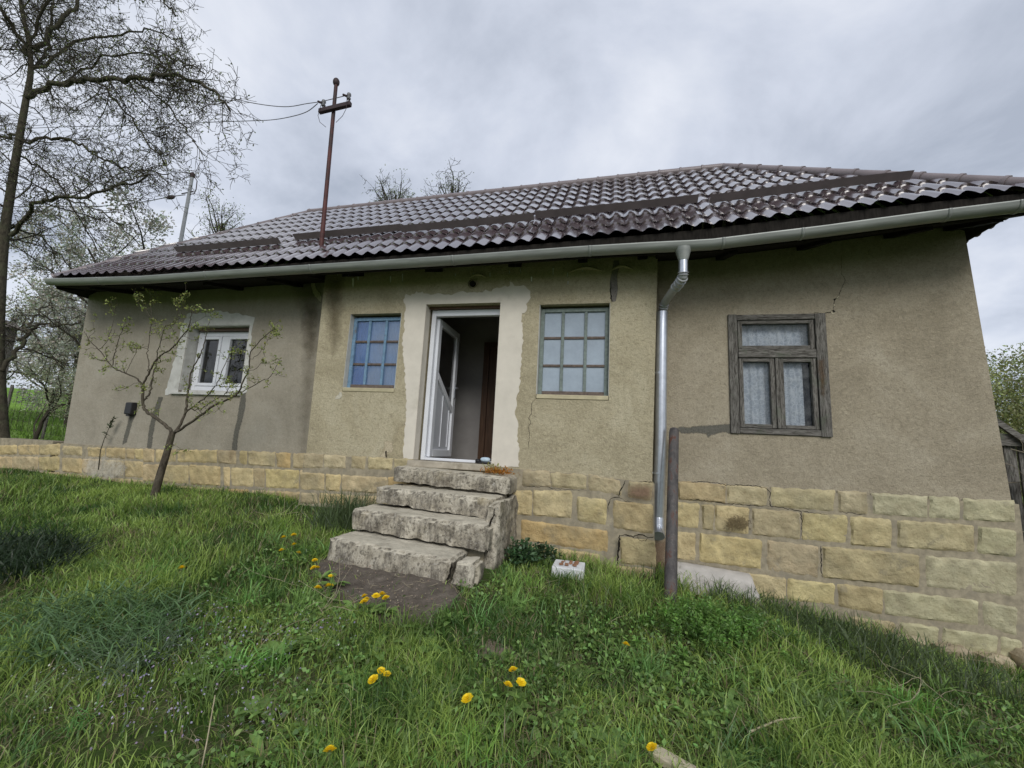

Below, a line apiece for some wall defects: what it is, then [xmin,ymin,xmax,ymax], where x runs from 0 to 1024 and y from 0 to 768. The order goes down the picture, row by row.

crack [617,534,653,564]